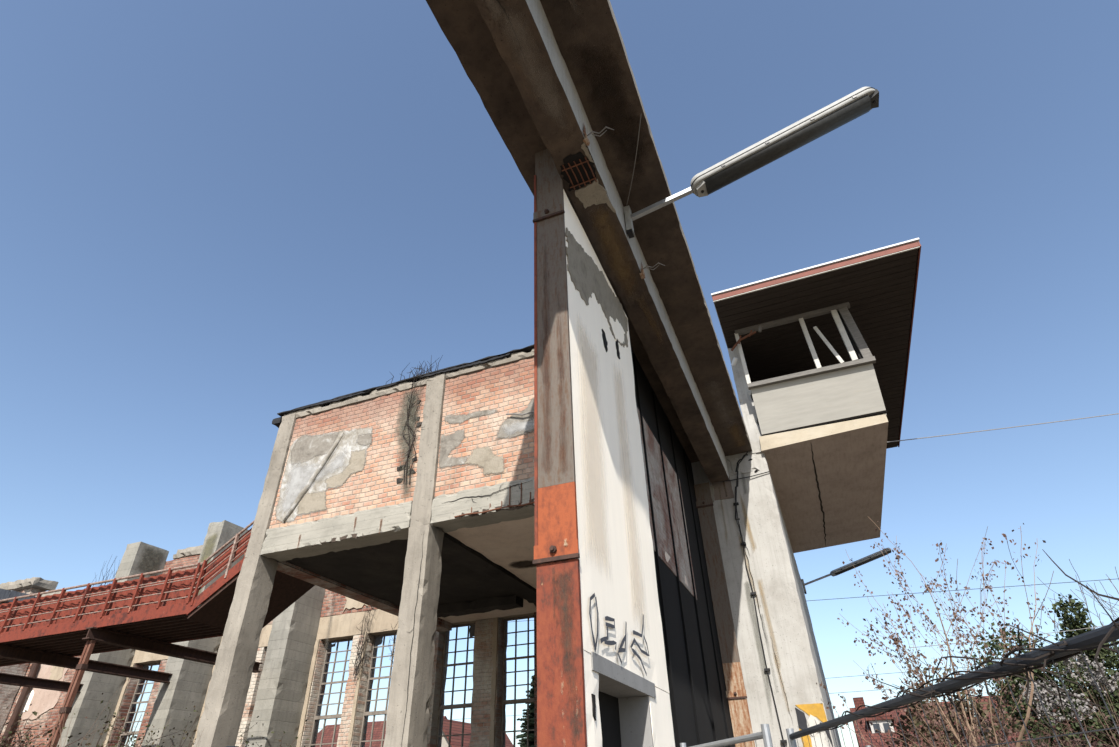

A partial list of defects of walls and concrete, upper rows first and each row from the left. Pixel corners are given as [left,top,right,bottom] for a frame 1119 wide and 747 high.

flaking render [276,427,373,523]
damp [397,390,420,494]
flaking render [439,397,534,475]
spalling [454,482,534,519]